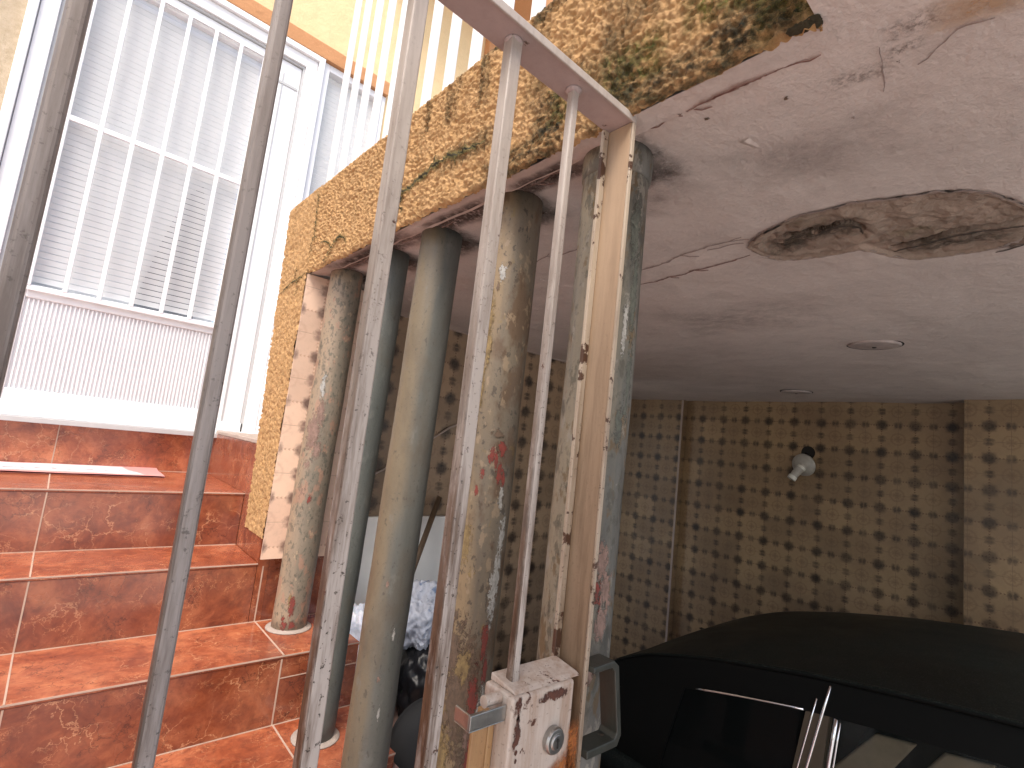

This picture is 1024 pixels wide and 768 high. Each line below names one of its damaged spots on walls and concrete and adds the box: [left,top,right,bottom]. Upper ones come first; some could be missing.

crack [918,18,994,65]
crack [651,55,821,129]
damp [507,93,577,192]
damp [340,249,370,283]
damp [430,204,484,254]
crack [641,237,750,285]
spalling [746,190,1024,261]
peeling [479,261,512,408]
peeling [436,429,508,768]